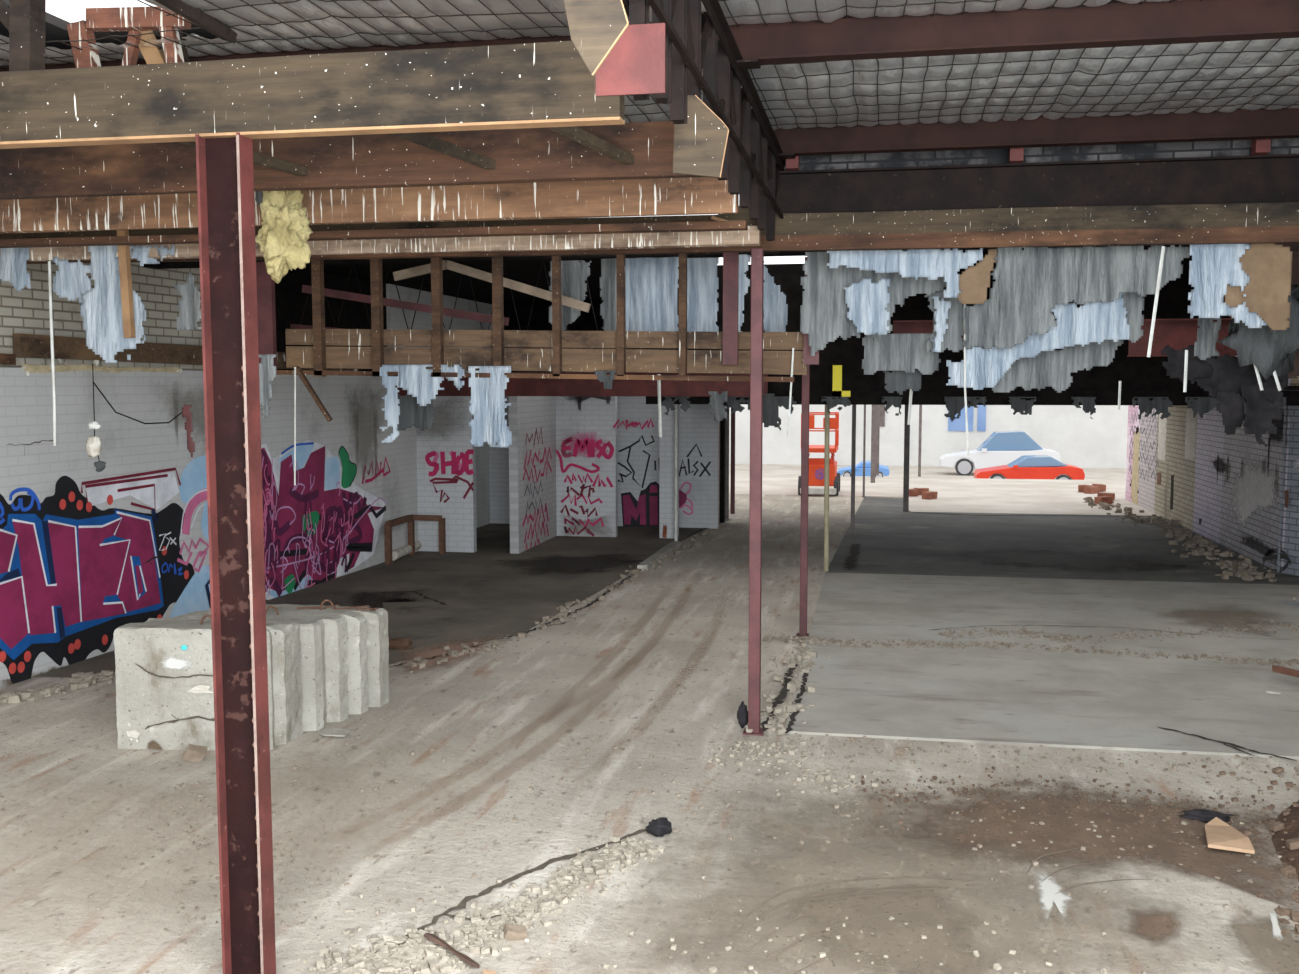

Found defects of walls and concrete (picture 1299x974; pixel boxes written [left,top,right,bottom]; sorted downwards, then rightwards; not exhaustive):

crack [760,664,811,733]
crack [374,829,647,953]